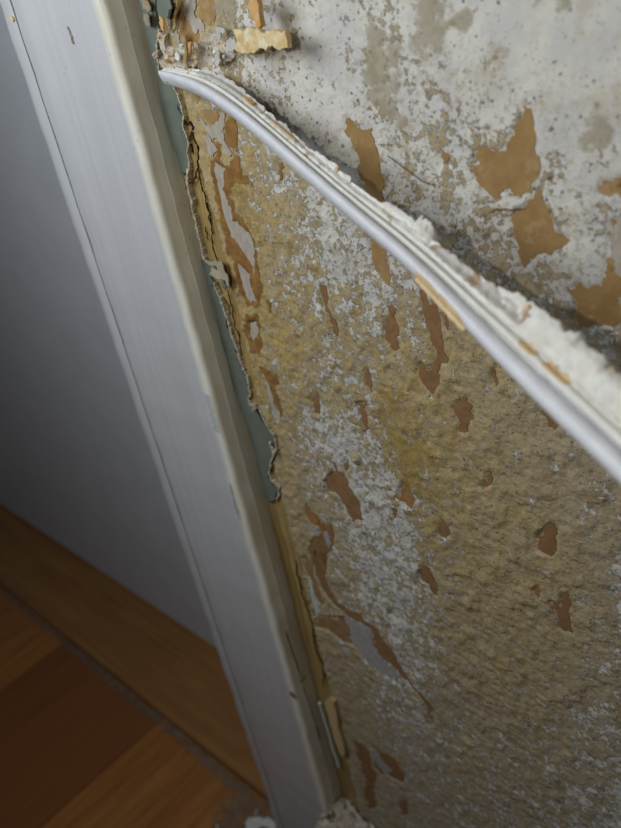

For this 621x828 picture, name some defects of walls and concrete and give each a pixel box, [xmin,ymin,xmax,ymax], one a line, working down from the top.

peeling [137,0,306,174]
crack [177,104,218,261]
peeling [344,117,386,203]
crack [488,206,526,214]
peeling [473,105,569,268]
peeling [370,237,391,286]
peeling [429,244,532,326]
peeling [568,249,621,327]
peeling [415,272,467,397]
peeling [517,341,572,385]
peeling [326,461,363,523]
peeling [299,504,435,725]